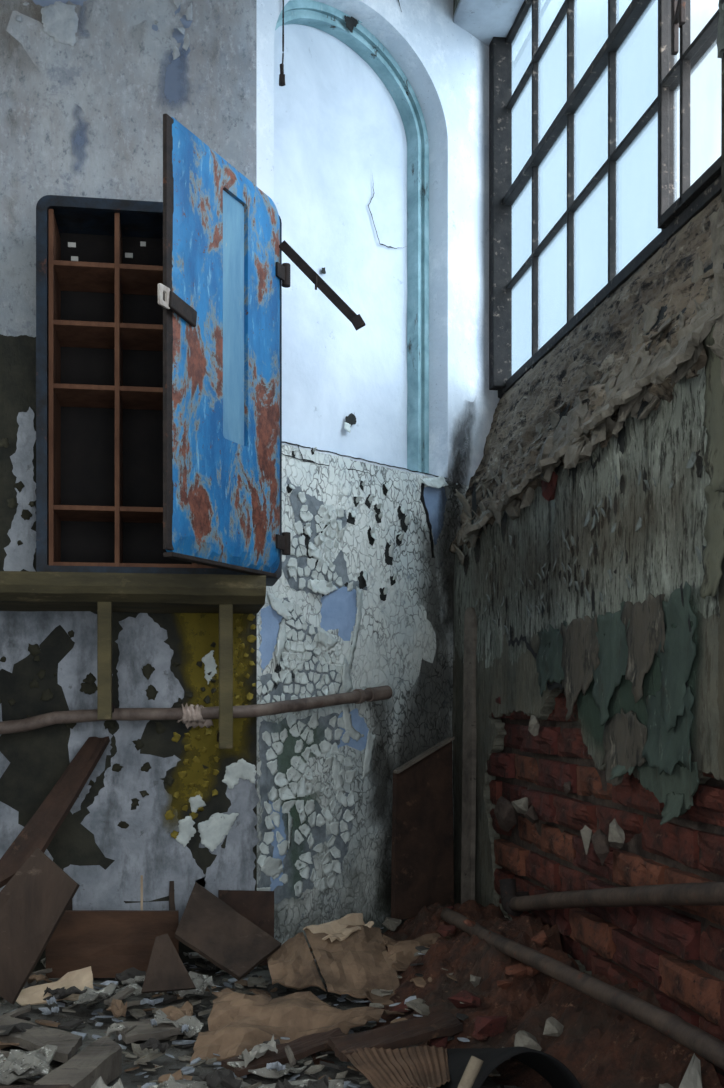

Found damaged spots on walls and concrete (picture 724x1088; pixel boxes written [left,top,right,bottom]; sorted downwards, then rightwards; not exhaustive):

peeling [16,0,87,46]
spalling [716,0,724,76]
peeling [0,407,36,572]
spalling [344,412,357,433]
spalling [420,202,724,903]
peeling [0,476,410,922]
spalling [508,905,724,1042]